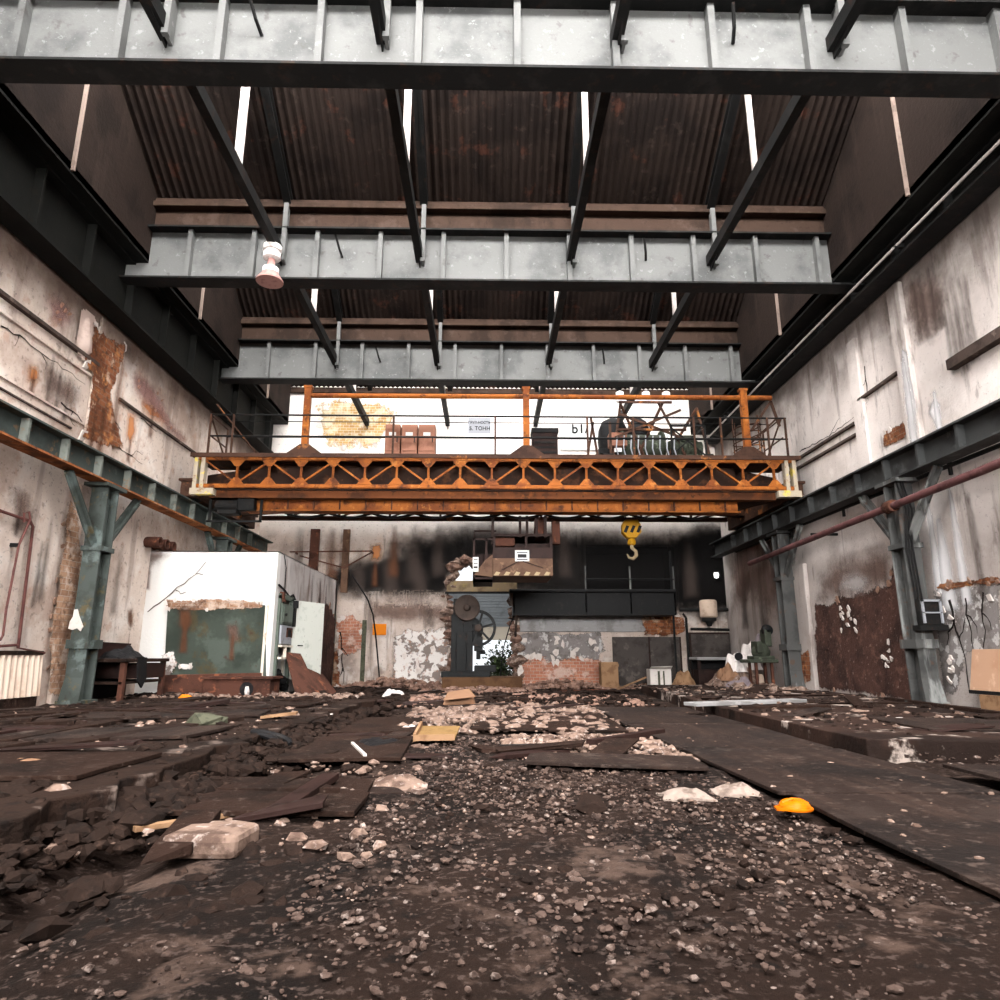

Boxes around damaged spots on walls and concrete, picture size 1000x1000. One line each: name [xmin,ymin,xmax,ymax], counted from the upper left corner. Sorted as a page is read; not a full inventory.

damp [909,286,942,330]
crack [1,325,83,383]
flaking render [78,321,127,451]
flaking render [316,398,397,451]
flaking render [881,420,906,447]
peeling [163,598,263,612]
flaking render [316,602,362,687]
peeling [392,554,473,683]
peeling [505,597,606,685]
flaking render [801,566,911,700]
peeling [933,576,1000,694]
crack [947,592,992,690]